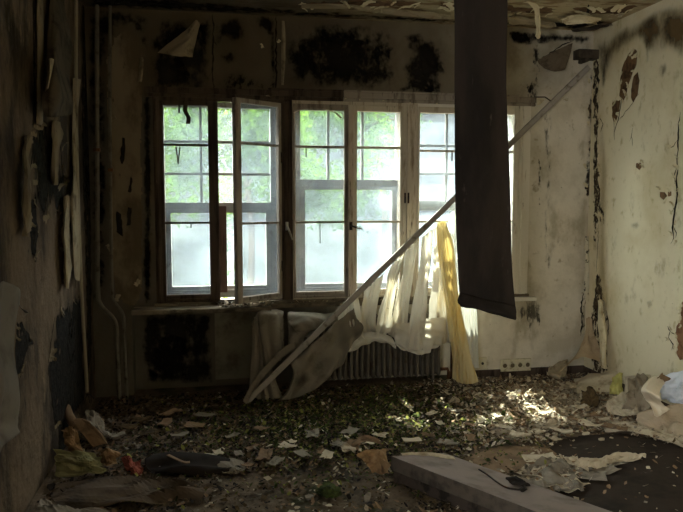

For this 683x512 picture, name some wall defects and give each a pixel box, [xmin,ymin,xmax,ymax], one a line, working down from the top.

leakage [507,21,604,64]
peeling [508,1,637,39]
peeling [612,48,639,129]
peeling [30,121,67,262]
leakage [81,0,455,368]
leakage [583,140,591,196]
peeling [593,60,604,254]
crack [665,112,681,245]
peeling [15,322,34,378]
leakage [143,314,211,383]
leakage [521,304,540,324]
peeling [591,263,609,354]